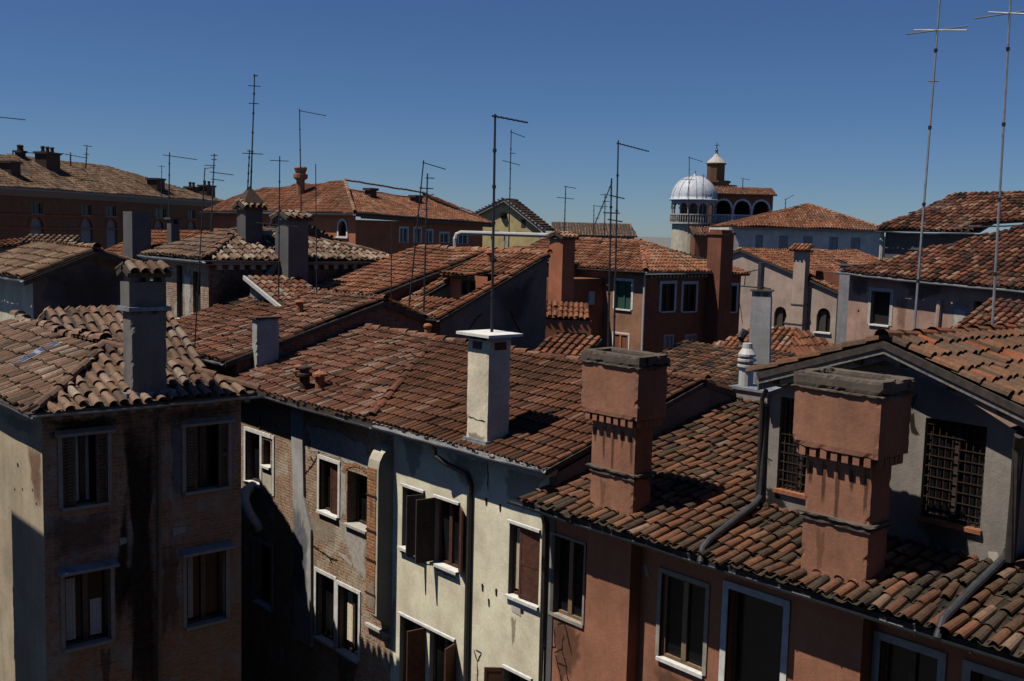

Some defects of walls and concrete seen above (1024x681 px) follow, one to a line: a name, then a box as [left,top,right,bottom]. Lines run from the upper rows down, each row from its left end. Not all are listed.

damp [115,432,155,681]
peeling [304,423,370,580]
crack [544,622,572,681]